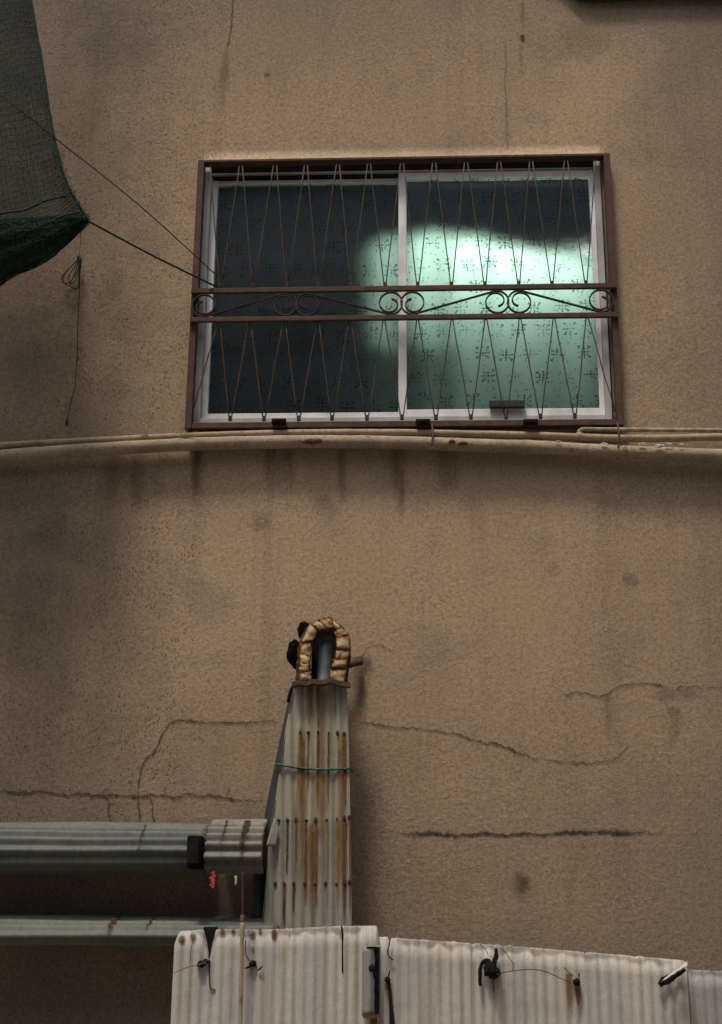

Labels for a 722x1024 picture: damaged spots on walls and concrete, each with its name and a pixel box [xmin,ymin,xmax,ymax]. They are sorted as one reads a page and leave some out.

crack [355,683,718,764]
crack [0,712,283,822]
crack [371,828,710,841]